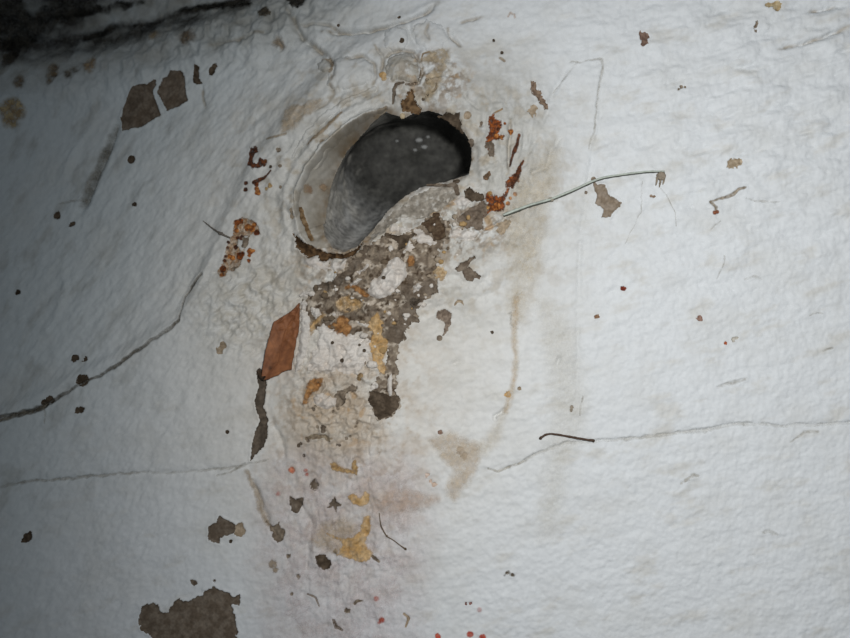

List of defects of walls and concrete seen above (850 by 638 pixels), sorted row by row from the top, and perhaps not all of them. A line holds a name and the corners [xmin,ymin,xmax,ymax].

water stain [0,0,250,82]
peeling [120,64,202,131]
corrosion [244,146,282,195]
corrosion [483,108,524,216]
corrosion [218,217,260,277]
water stain [310,284,369,336]
spalling [289,179,489,421]
crack [0,275,201,422]
peeling [250,368,269,461]
water stain [303,378,323,404]
water stain [316,516,380,563]
peeling [138,579,241,638]